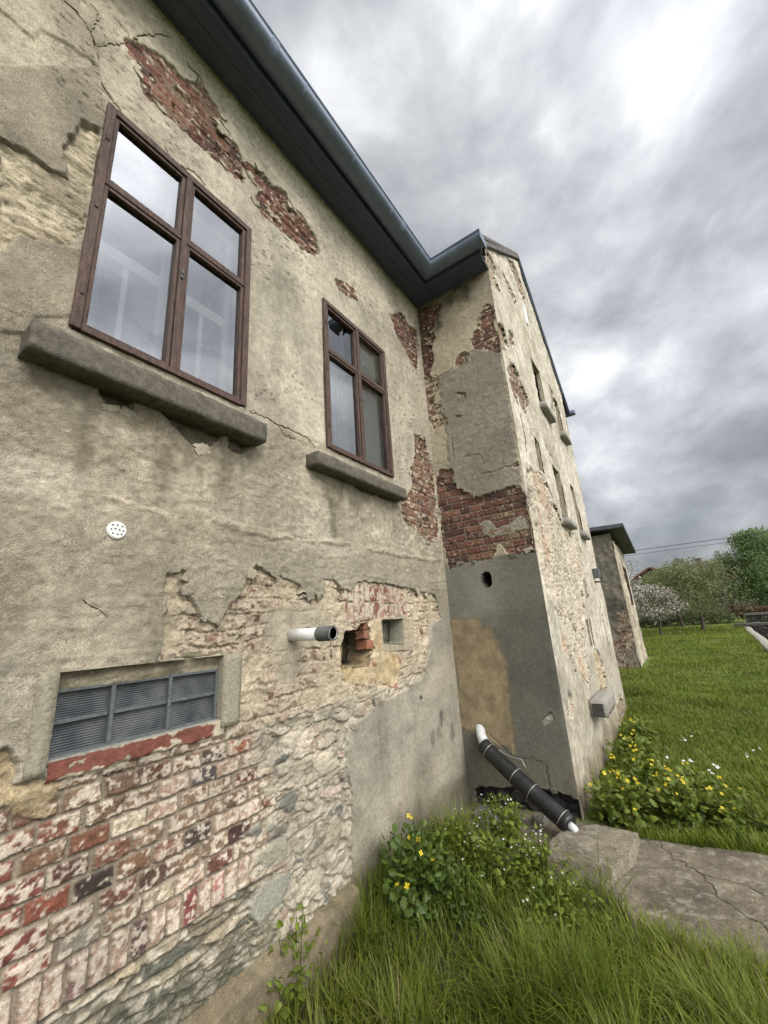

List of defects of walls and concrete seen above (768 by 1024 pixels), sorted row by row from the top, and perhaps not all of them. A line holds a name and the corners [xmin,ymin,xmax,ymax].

crack [63,0,171,111]
flaking render [125,41,318,256]
flaking render [335,279,358,301]
crack [250,411,315,447]
flaking render [389,299,606,690]
water stain [451,618,515,755]
flaking render [0,568,440,1024]
crack [660,841,768,931]